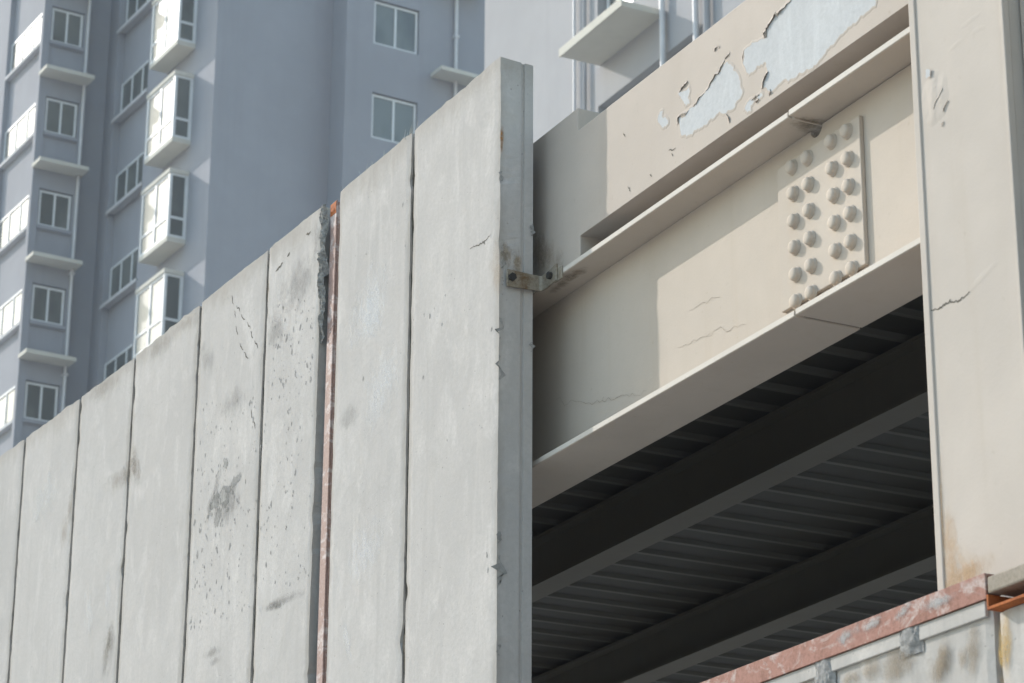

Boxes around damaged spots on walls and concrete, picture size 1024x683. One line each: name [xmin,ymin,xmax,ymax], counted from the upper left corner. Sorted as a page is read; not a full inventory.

peeling [656,0,878,139]
crack [232,298,258,358]
crack [931,291,970,311]
spalling [486,531,507,584]